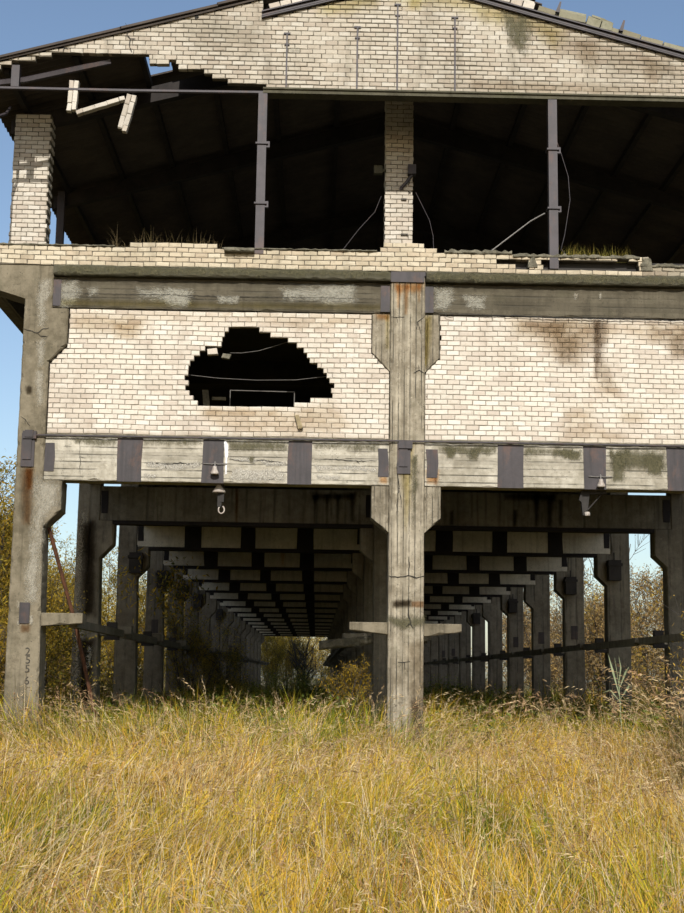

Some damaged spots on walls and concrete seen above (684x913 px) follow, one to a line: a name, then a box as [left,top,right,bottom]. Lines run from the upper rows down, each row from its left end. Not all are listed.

damp [505,14,531,50]
damp [560,450,579,460]
damp [610,451,629,482]
damp [644,455,662,475]